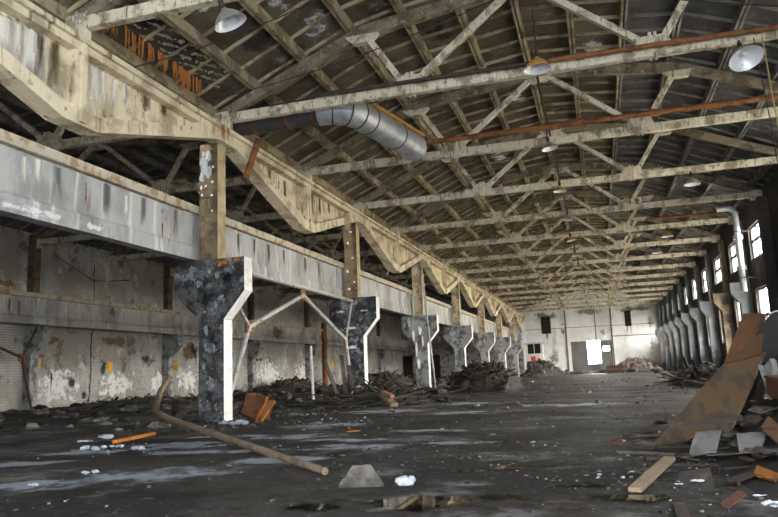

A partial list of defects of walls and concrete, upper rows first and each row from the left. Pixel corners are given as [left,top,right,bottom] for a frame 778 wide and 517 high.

corrosion [105,25,201,95]
water stain [22,156,41,181]
peeling [199,151,214,196]
crack [87,329,95,403]
peeling [38,366,162,407]
peeling [173,363,213,397]
peeling [256,357,317,388]